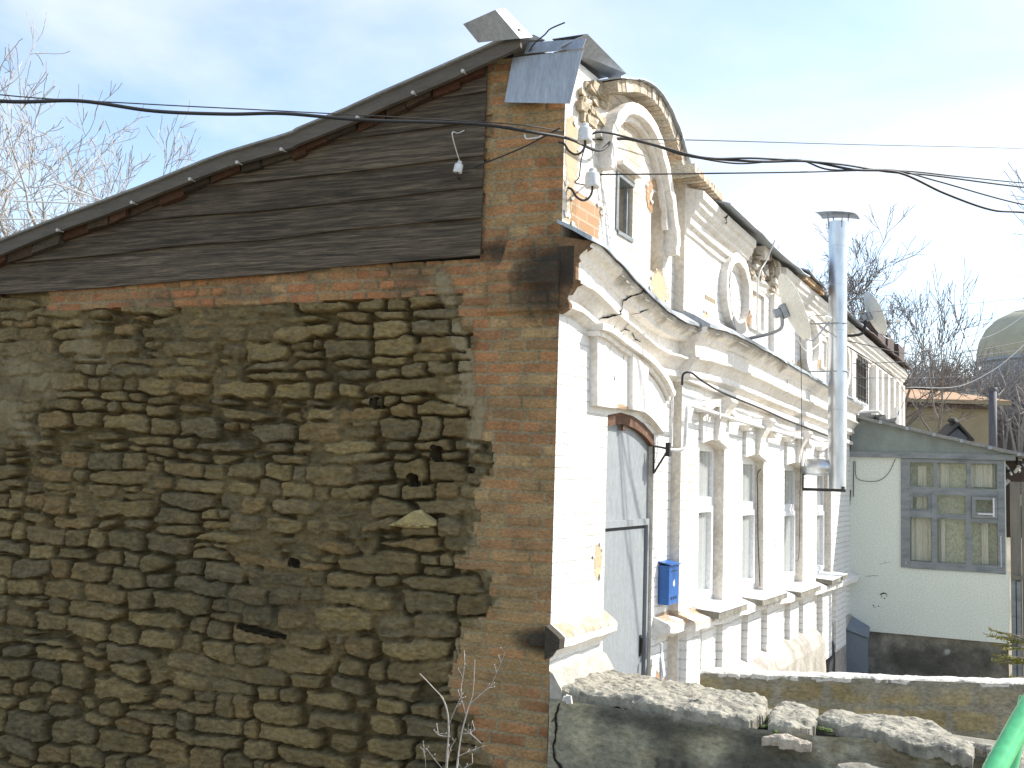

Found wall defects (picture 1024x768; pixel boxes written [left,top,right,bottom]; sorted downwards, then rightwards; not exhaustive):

spalling [564,80,609,240]
flaking render [646,179,661,214]
damp [516,246,574,312]
peeling [649,268,669,304]
crack [599,290,647,380]
crack [551,703,562,768]